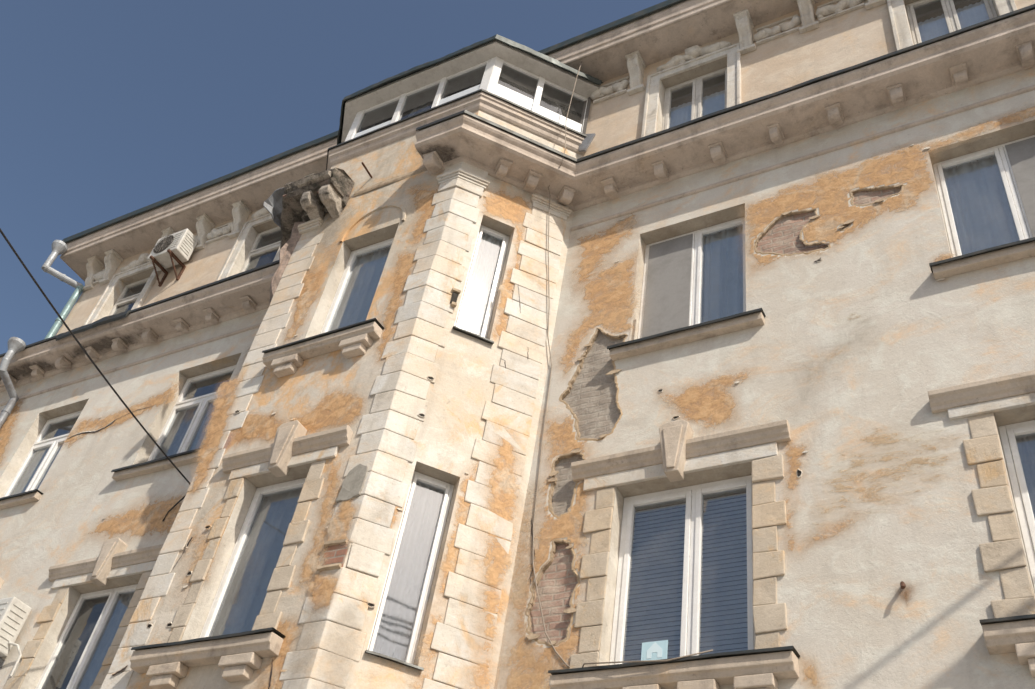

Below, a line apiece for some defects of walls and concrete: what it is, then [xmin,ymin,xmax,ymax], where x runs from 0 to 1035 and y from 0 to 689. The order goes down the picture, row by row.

spalling [280,168,355,249]
peeling [746,107,1035,269]
spalling [450,288,461,307]
crack [68,406,152,439]
peeling [91,379,363,539]
spalling [525,215,639,670]
peeling [658,372,748,428]
peeling [299,470,356,610]
peeling [440,469,476,593]
peeling [470,438,520,689]